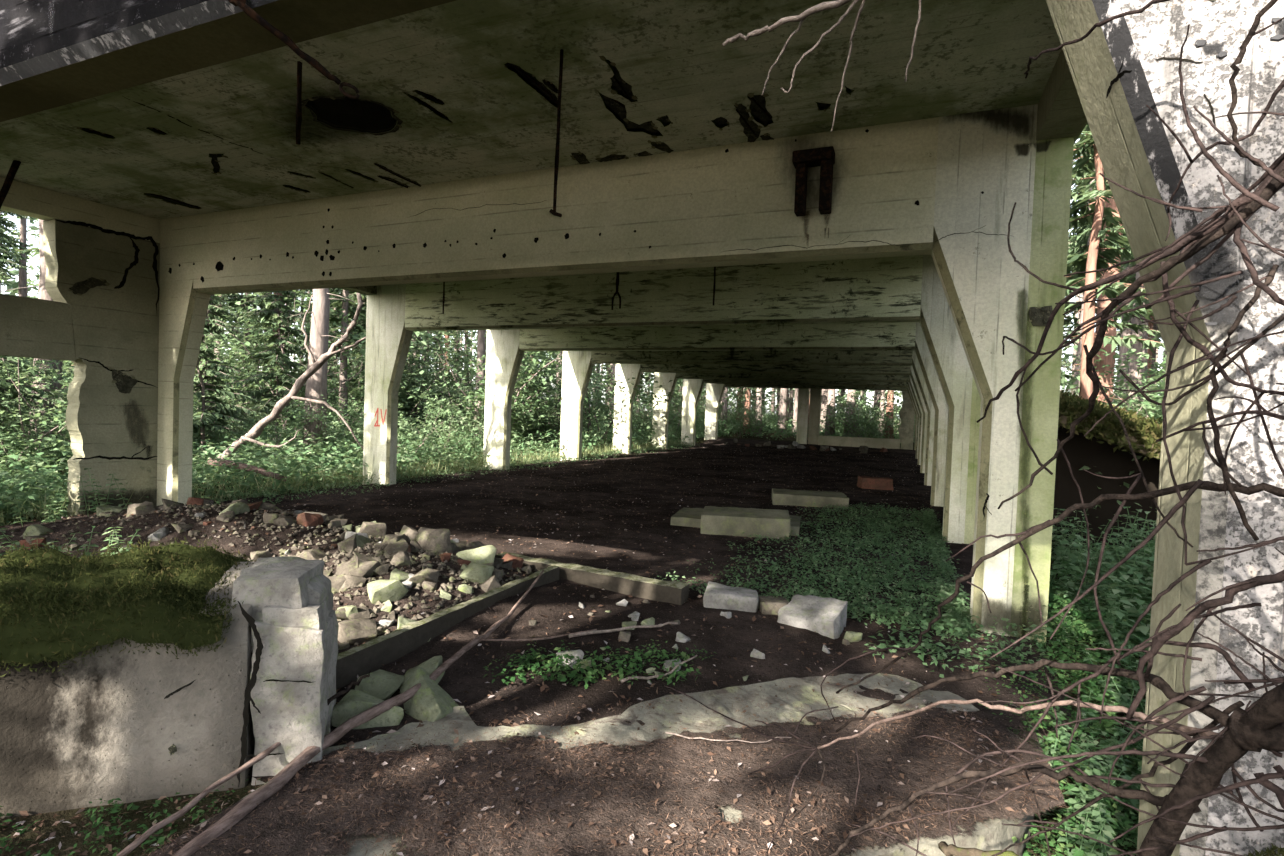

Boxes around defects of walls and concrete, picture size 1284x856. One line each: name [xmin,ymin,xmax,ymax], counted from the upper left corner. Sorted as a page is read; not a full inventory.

spalling [405,90,453,124]
spalling [505,62,558,104]
spalling [570,56,674,164]
spalling [714,93,774,142]
crack [55,219,160,311]
crack [81,358,158,388]
crack [73,447,157,460]
leakage [124,402,152,459]
crack [237,601,312,787]